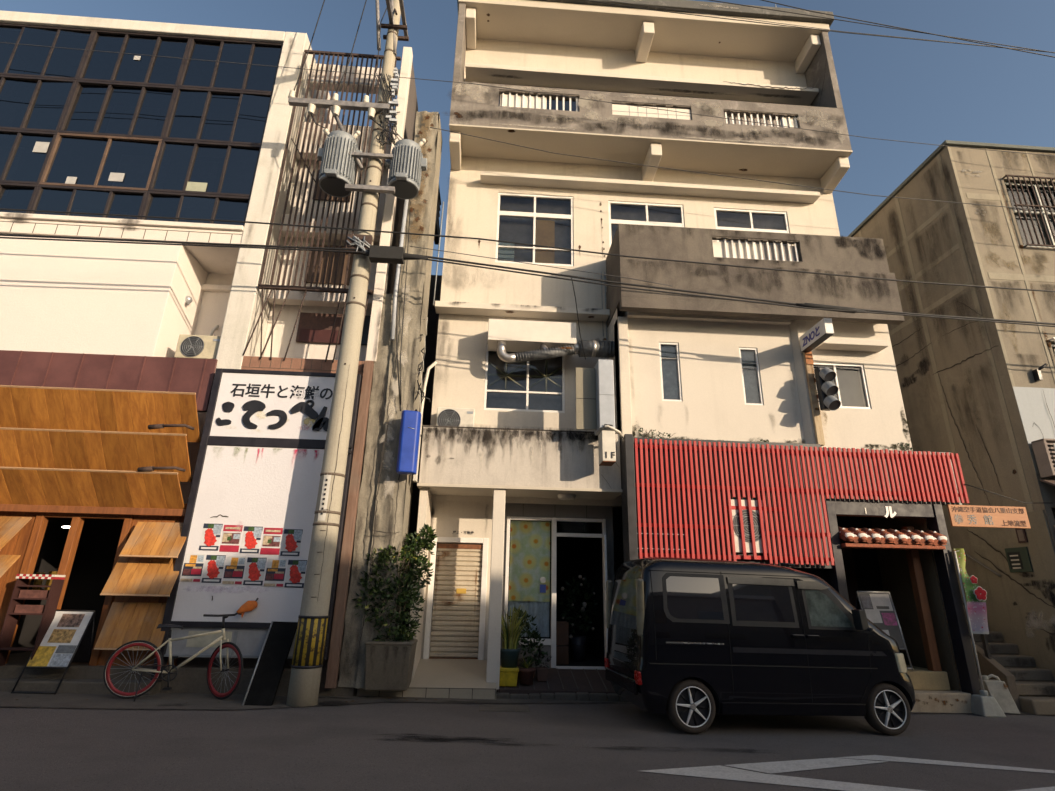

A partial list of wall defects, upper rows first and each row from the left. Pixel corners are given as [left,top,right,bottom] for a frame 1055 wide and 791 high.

damp [422,427,598,454]